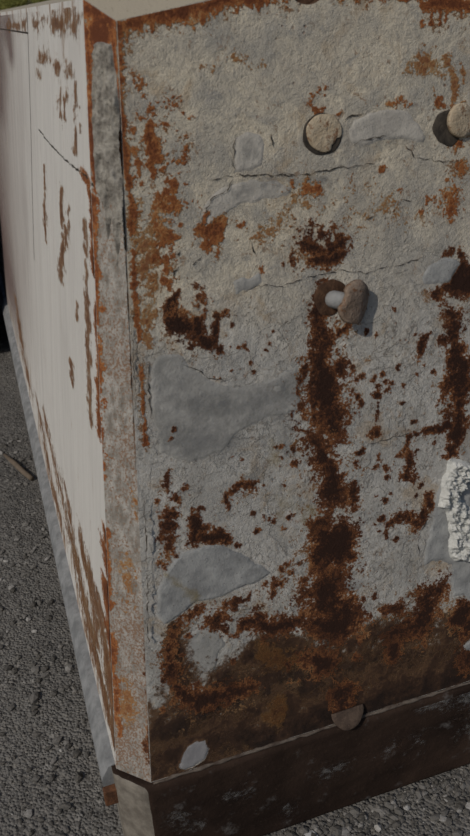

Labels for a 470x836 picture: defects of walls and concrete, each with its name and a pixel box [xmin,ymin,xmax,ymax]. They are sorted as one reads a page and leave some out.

water stain [325,290,344,309]